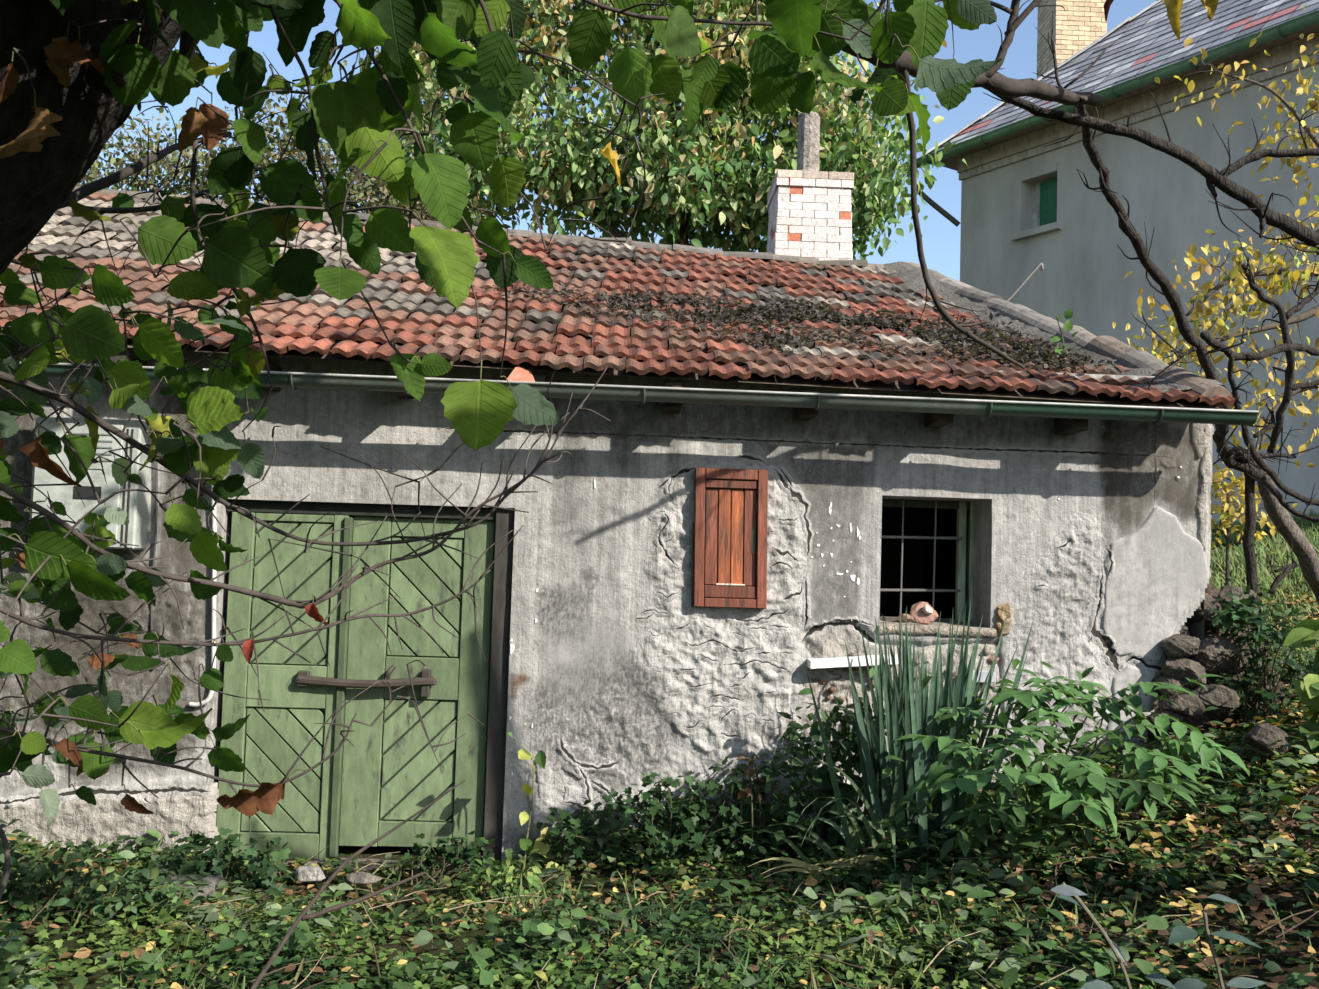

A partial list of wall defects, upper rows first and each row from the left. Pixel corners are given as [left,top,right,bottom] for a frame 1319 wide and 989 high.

crack [437,425,457,433]
leakage [1099,420,1200,528]
crack [500,427,1171,742]
peeling [811,502,861,585]
crack [0,784,213,809]
crack [556,734,623,820]